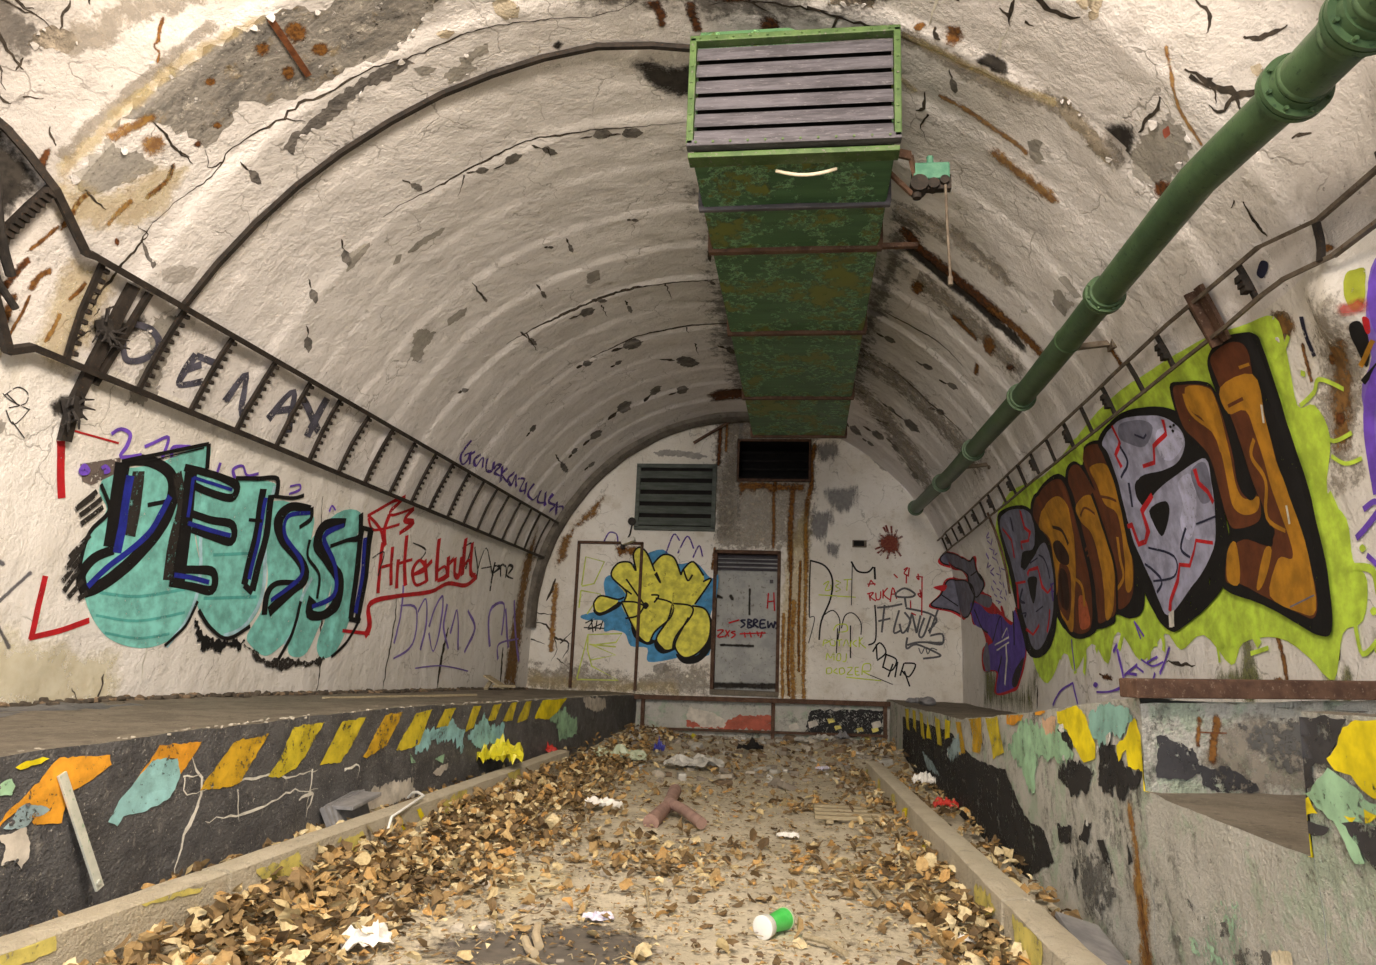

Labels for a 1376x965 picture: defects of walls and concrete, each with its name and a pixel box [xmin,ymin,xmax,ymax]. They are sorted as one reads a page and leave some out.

crack [999,0,1080,27]
crack [1243,25,1287,41]
rust [106,115,166,156]
flaking render [70,0,489,195]
crack [72,2,676,357]
rust [939,95,1059,203]
flaking render [1054,96,1112,166]
flaking render [1129,120,1193,189]
crack [1184,68,1255,114]
rust [0,164,176,342]
rust [739,443,817,699]
peeling [1238,718,1303,774]